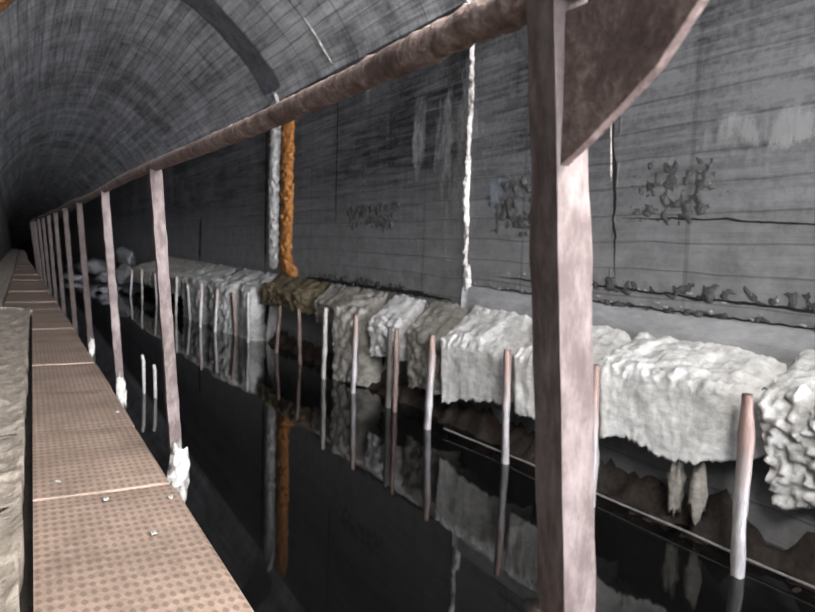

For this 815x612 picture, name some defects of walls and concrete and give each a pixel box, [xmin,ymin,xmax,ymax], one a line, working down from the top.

leakage [181,0,280,106]
leakage [268,126,281,269]
corrosion [279,120,298,277]
leakage [413,117,424,172]
leakage [437,45,477,291]
spalling [484,166,531,238]
spalling [630,157,729,225]
crack [610,122,815,279]
leakage [718,107,815,147]